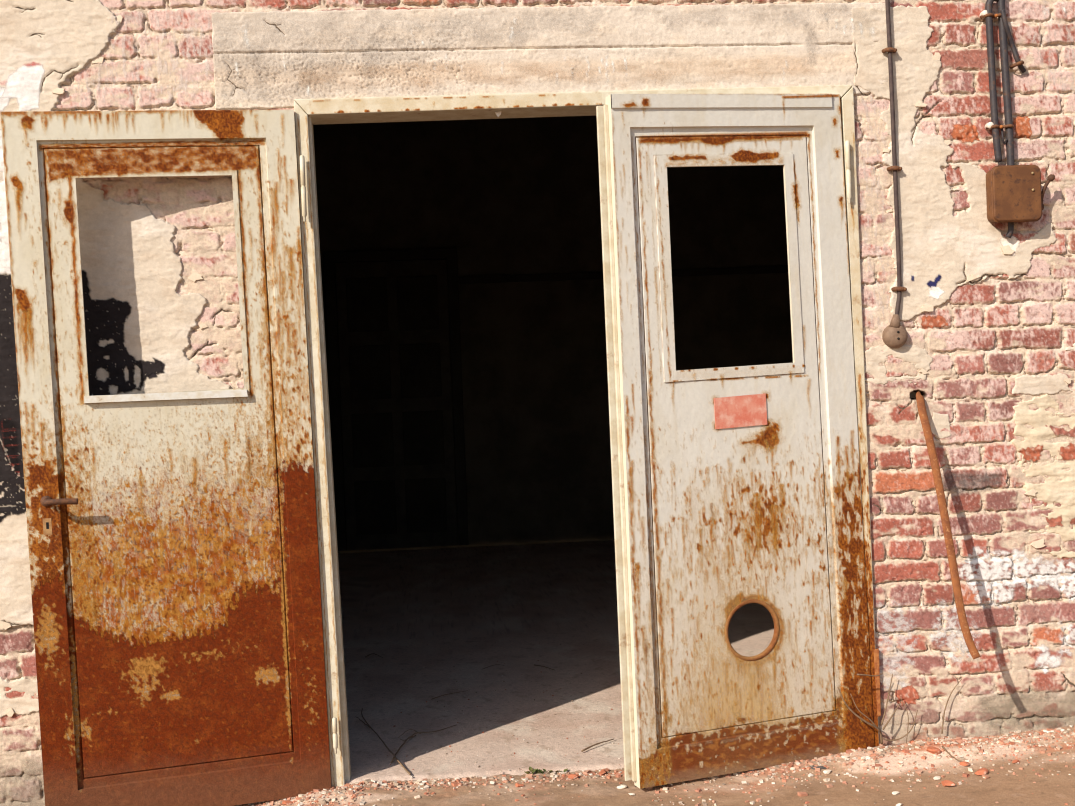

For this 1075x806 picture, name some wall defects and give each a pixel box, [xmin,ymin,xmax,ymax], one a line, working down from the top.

crack [41,67,76,89]
flaking render [0,0,123,631]
flaking render [75,178,231,396]
rust [0,100,343,806]
rust [614,130,820,371]
rust [625,206,879,789]
flaking render [864,345,933,400]
flaking render [931,412,951,439]
flaking render [852,5,1057,329]
damp [959,547,1075,607]
flaking render [1009,373,1075,559]
flaking render [0,675,39,718]